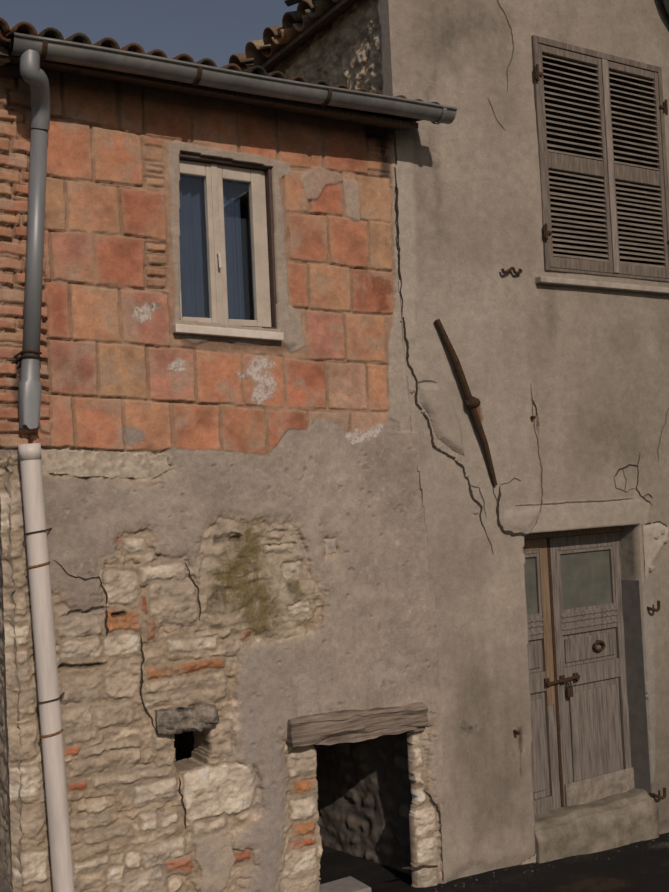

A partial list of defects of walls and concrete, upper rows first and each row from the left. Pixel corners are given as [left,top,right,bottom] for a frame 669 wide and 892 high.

crack [488,0,514,127]
crack [396,183,669,555]
crack [54,560,109,636]
crack [185,562,201,620]
flaking render [643,523,669,580]
flaking render [0,458,53,892]
crack [140,635,155,728]
flaking render [52,517,325,892]
crack [178,778,186,828]